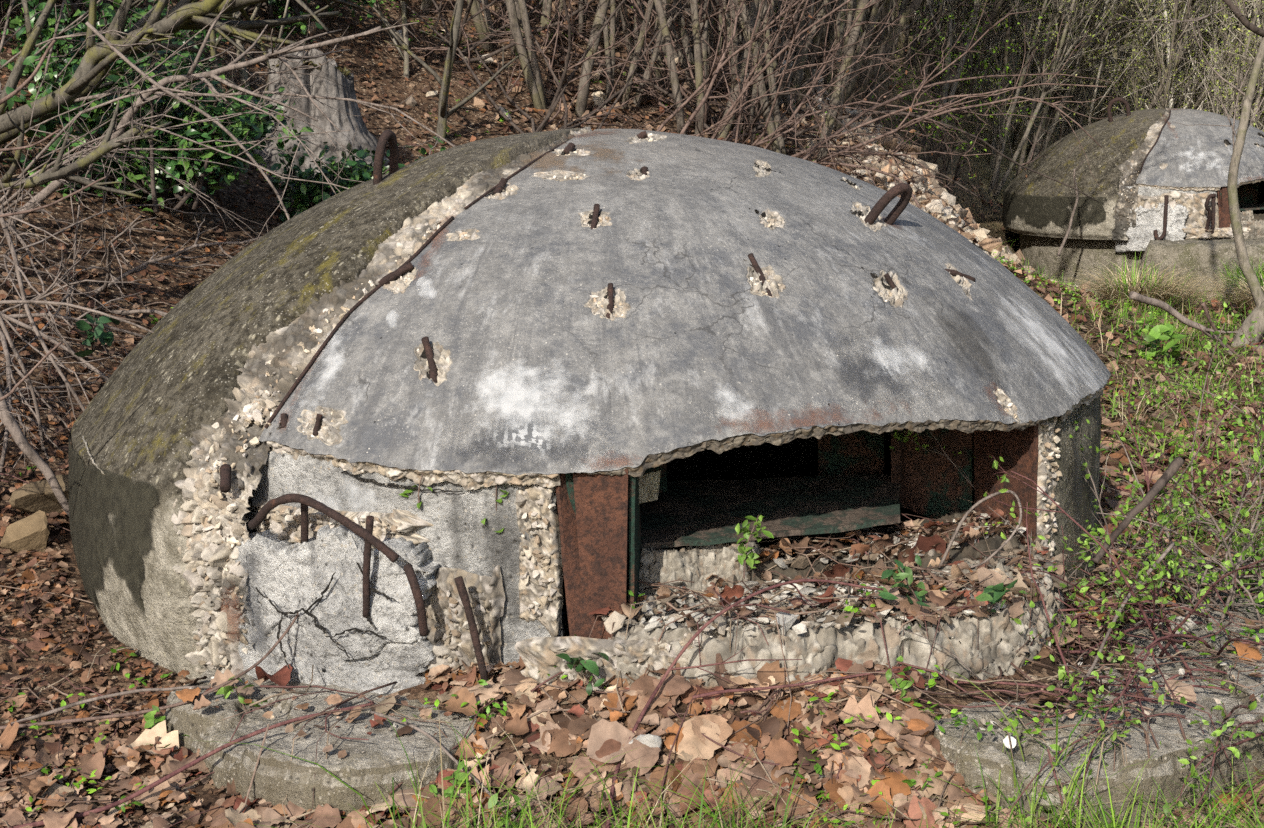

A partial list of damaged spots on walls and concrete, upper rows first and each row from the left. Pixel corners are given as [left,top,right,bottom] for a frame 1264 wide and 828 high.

spalling [1111,106,1264,240]
spalling [171,126,756,695]
crack [256,562,396,669]